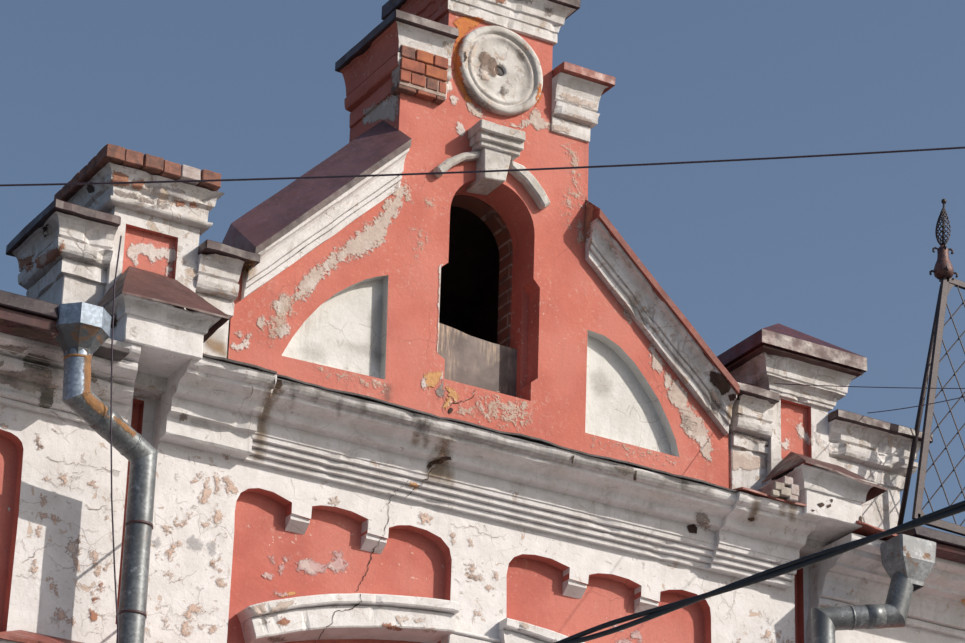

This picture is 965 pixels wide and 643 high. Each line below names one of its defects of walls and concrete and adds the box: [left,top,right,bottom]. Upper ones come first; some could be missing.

spalling [362,16,493,124]
spalling [479,52,509,96]
spalling [112,170,198,209]
peeling [127,242,178,276]
peeling [231,180,435,352]
peeling [421,371,536,430]
peeling [647,343,731,463]
peeling [65,535,111,629]
peeling [154,471,239,588]
spalling [248,591,296,643]
peeling [262,550,349,580]
crack [318,469,433,640]